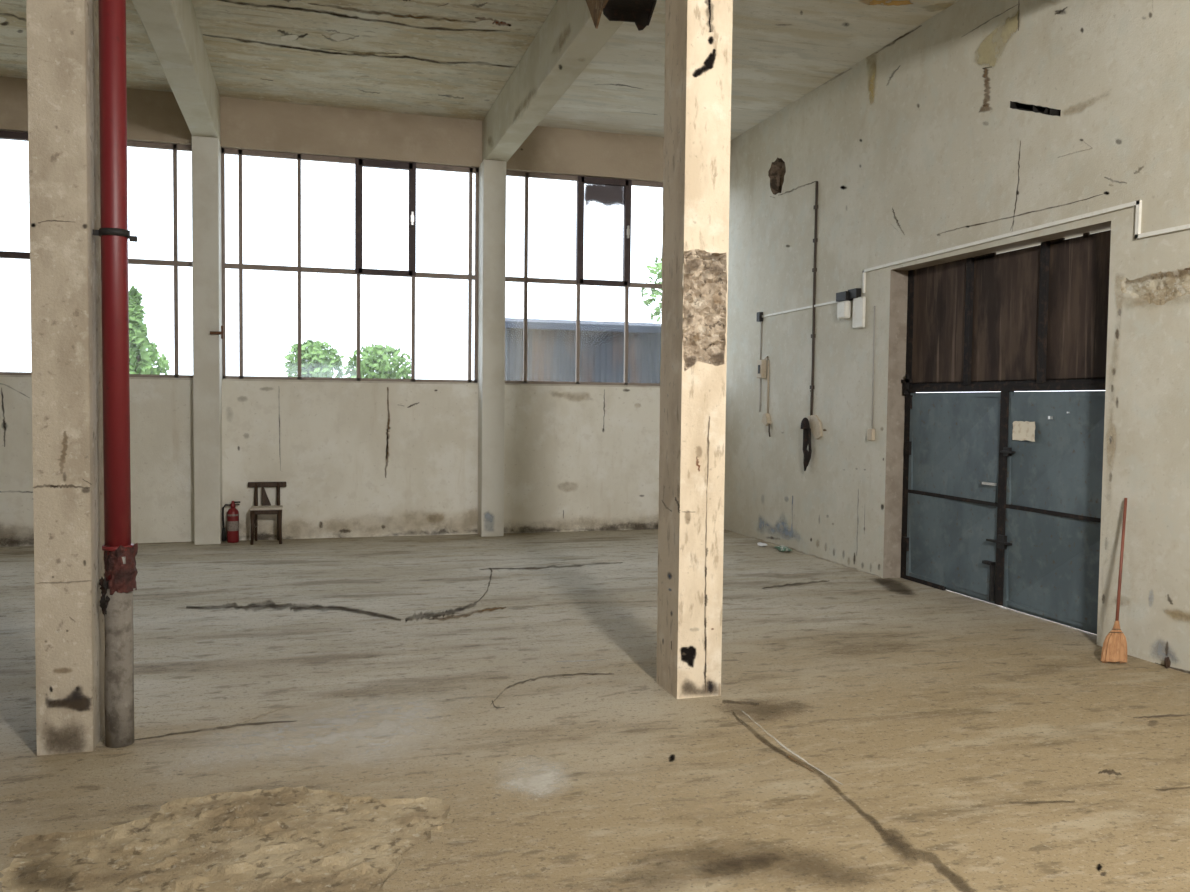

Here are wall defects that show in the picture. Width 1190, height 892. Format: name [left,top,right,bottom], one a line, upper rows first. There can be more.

crack [203,0,511,67]
crack [693,0,716,77]
spalling [682,249,727,371]
spalling [1119,266,1190,305]
crack [1,388,26,447]
crack [383,387,391,478]
crack [186,562,623,621]